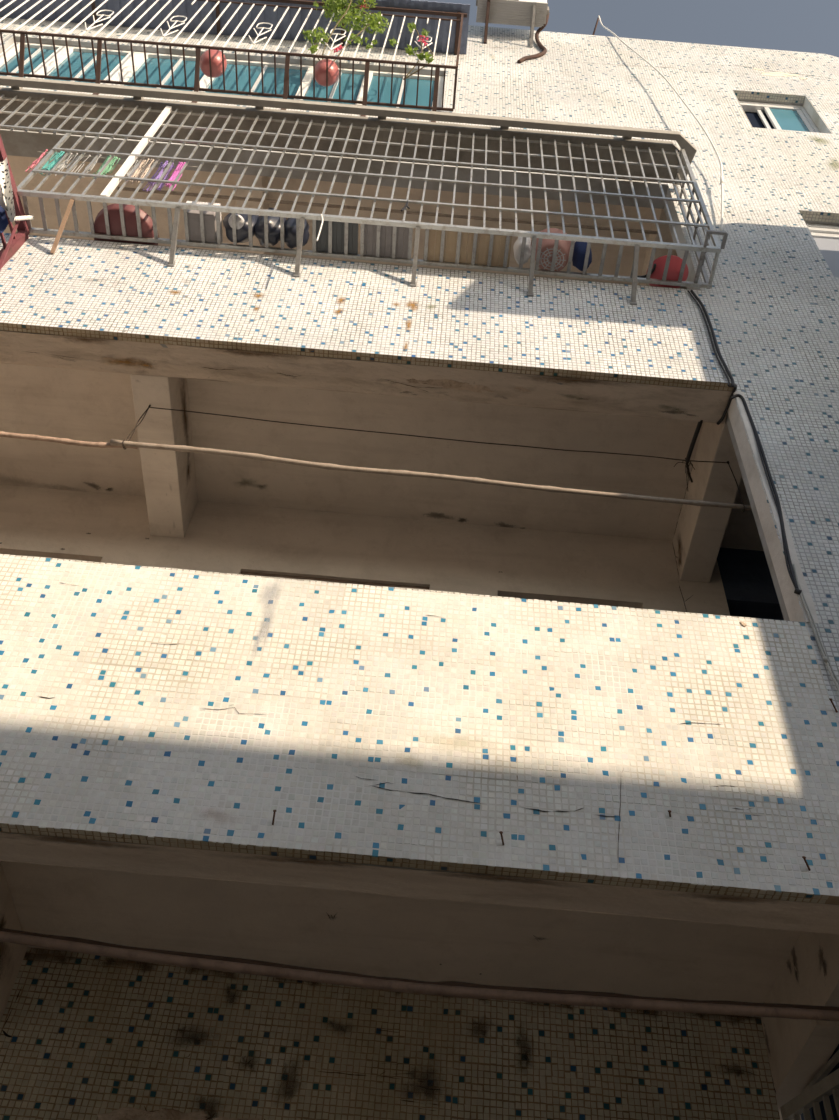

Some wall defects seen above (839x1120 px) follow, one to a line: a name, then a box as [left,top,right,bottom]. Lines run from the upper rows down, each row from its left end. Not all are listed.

crack [356,776,482,804]
crack [522,786,621,869]